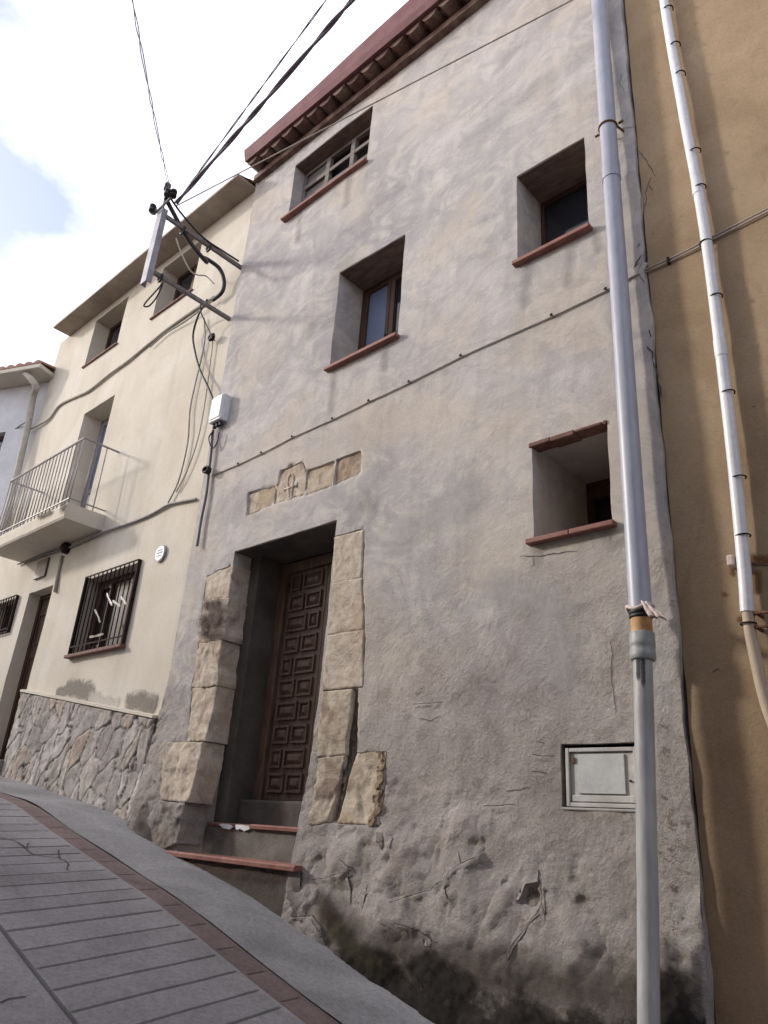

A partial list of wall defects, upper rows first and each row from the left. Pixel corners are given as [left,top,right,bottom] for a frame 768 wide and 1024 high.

crack [312,847,487,948]
crack [506,874,546,958]
spalling [513,868,540,907]
water stain [322,912,637,1024]
water stain [660,936,706,1024]